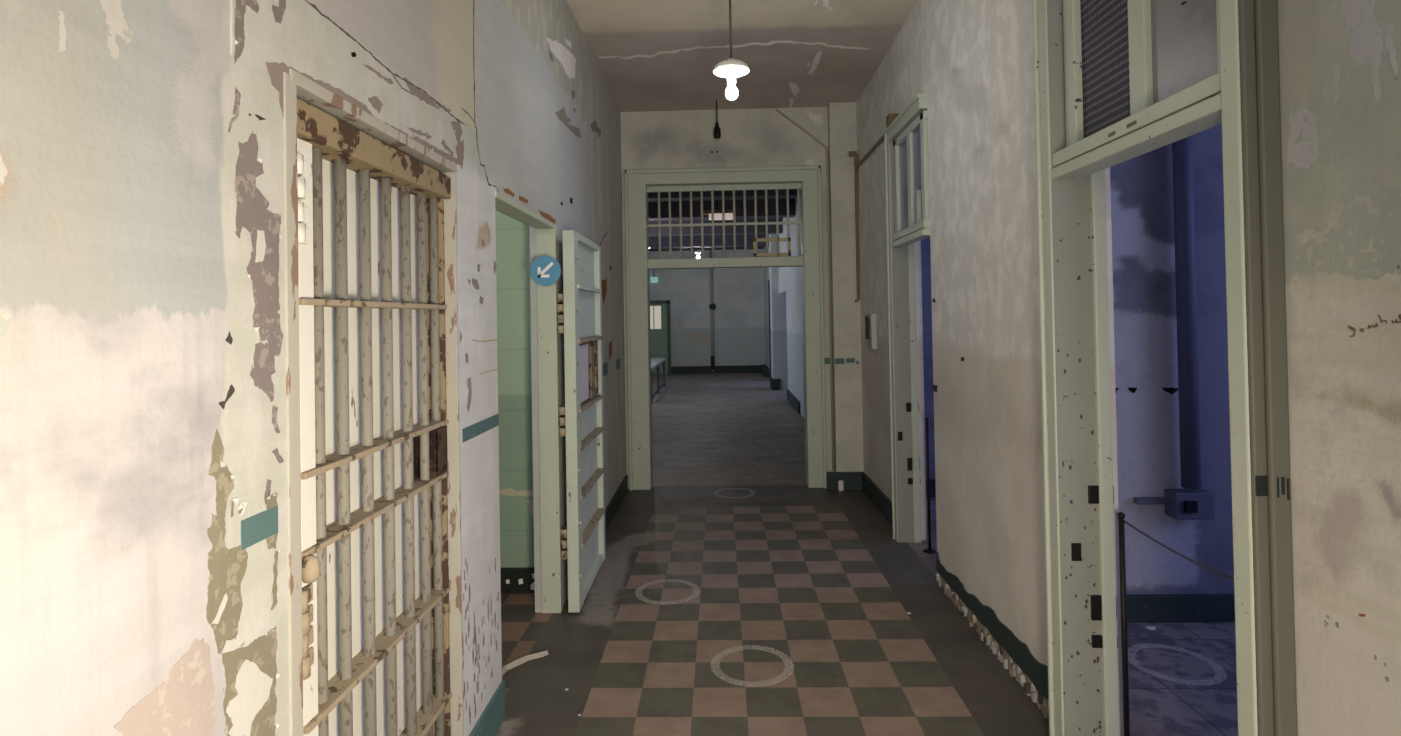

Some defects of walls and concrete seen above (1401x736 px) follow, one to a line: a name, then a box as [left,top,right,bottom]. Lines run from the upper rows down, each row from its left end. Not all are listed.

peeling [58,11,66,52]
peeling [100,0,134,59]
peeling [234,0,286,64]
crack [598,0,871,59]
peeling [265,62,464,169]
peeling [1287,103,1319,169]
peeling [1292,186,1401,280]
peeling [228,87,285,463]
peeling [219,384,235,409]
flaking render [114,429,281,736]
flaking render [936,571,1079,719]